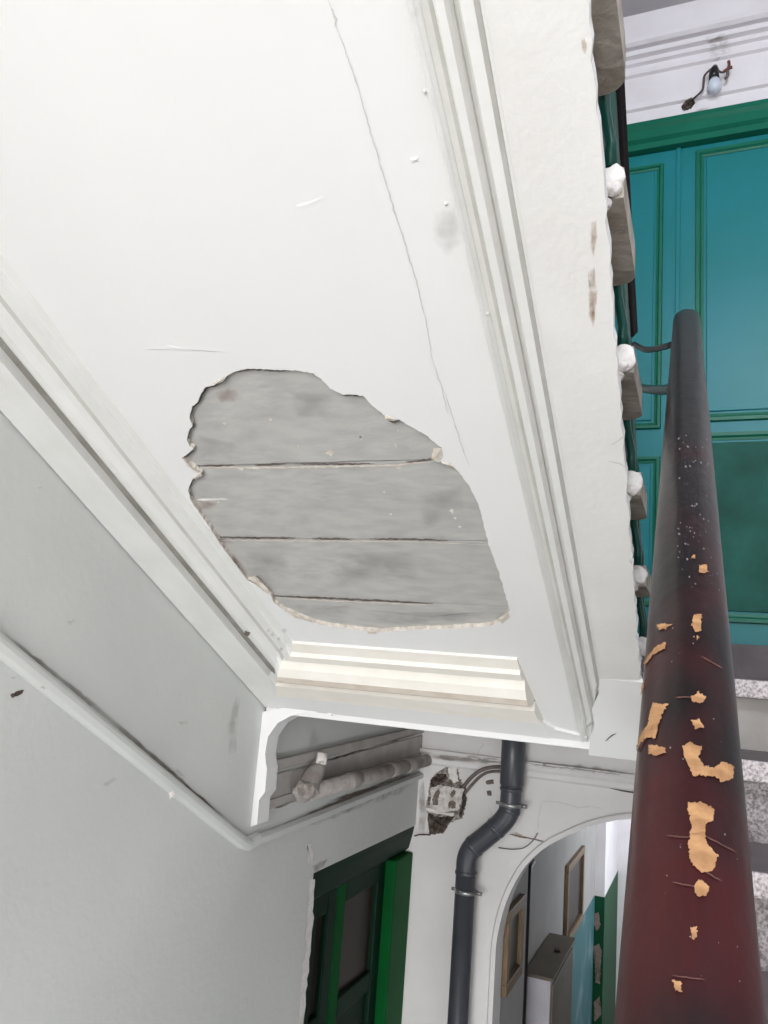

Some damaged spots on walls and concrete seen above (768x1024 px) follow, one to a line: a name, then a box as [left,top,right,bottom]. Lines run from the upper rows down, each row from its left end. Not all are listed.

crack [328,1,470,467]
flaking render [184,369,510,634]
flaking render [633,565,648,591]
peeling [639,623,672,666]
peeling [691,614,702,640]
peeling [690,691,706,703]
peeling [636,702,668,756]
peeling [682,741,734,782]
flaking render [425,767,468,835]
peeling [687,801,719,897]